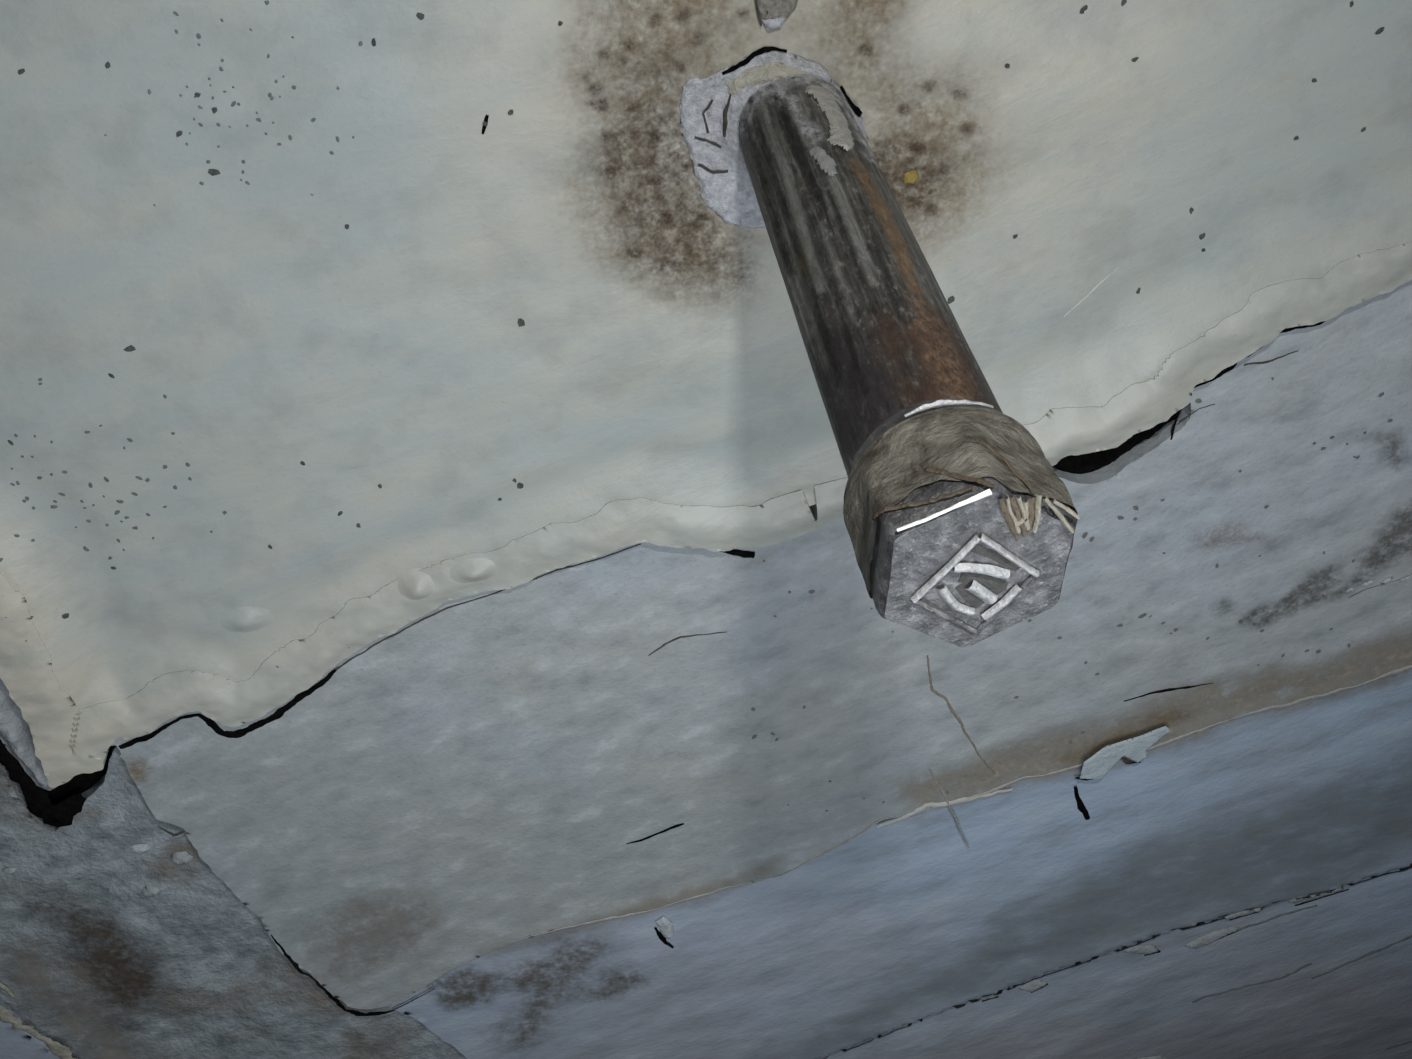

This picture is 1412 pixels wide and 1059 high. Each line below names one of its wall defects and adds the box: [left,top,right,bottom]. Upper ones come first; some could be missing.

rust [590,0,724,271]
rust [850,85,981,406]
peeling [1023,241,1412,466]
spalling [1247,513,1412,626]
flaking render [0,477,848,1059]
crack [626,823,684,844]
peeling [527,665,1412,949]
crack [1074,785,1090,820]
crack [822,863,1412,1059]